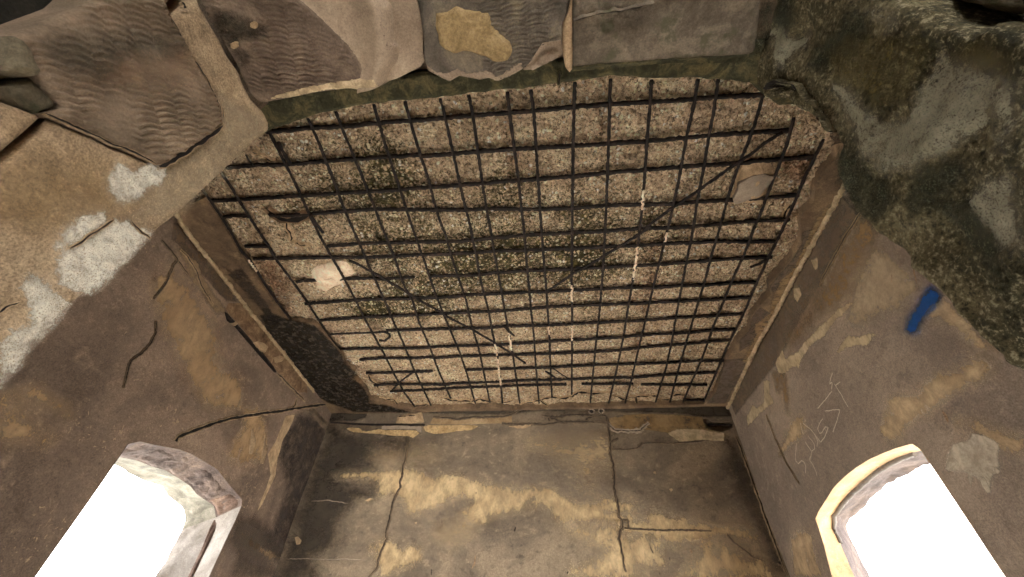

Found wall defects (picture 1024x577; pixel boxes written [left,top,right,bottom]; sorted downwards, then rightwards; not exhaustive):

crack [68,218,189,388]
spalling [195,75,852,438]
damp [848,248,916,324]
damp [929,299,990,349]
crack [173,373,326,442]
crack [368,436,410,577]
crack [433,390,788,576]